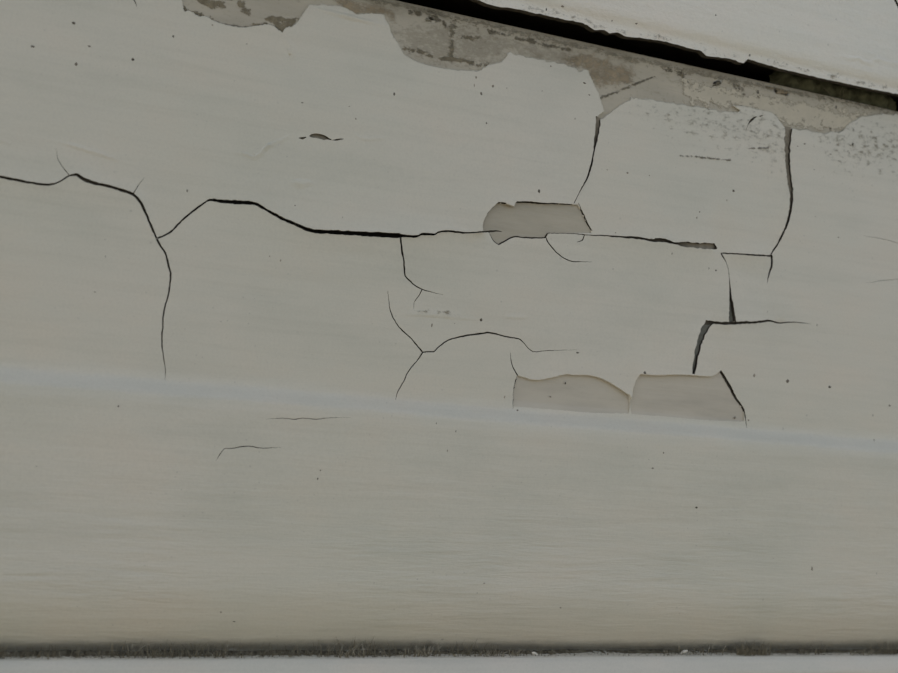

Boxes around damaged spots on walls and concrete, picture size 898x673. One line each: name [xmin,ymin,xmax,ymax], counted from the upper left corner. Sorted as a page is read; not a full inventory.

peeling [182,0,898,134]
crack [0,117,792,370]
peeling [483,203,591,244]
crack [692,298,808,373]
peeling [513,372,744,422]
crack [720,371,743,410]